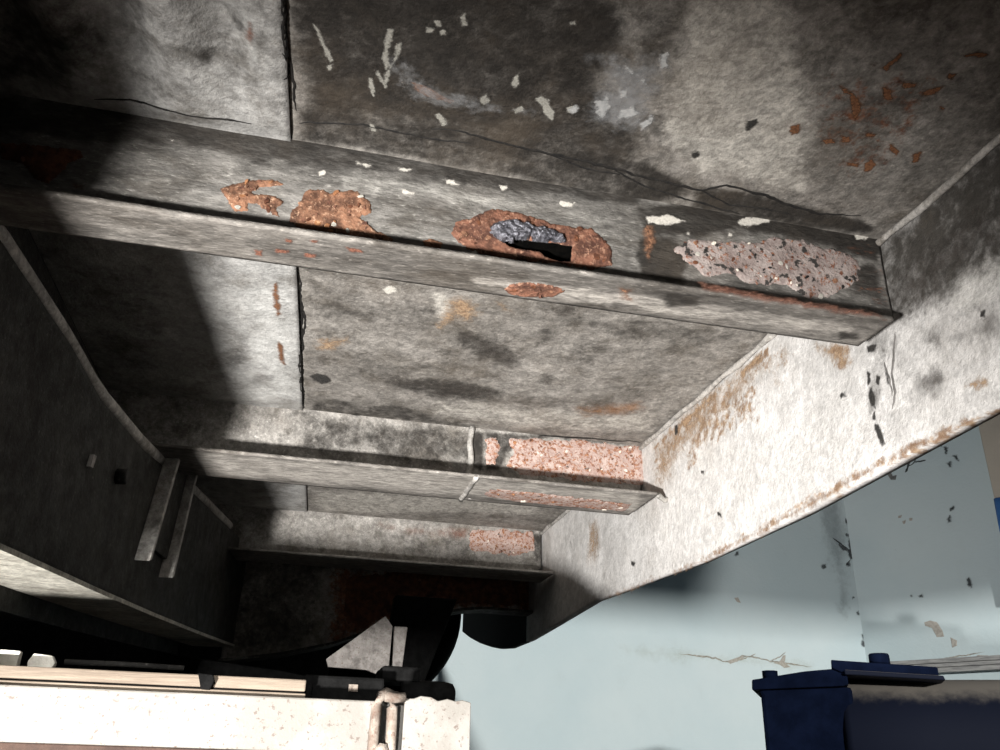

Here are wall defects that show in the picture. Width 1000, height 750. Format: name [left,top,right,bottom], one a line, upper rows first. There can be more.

crack [94,98,251,124]
crack [281,0,861,216]
corrosion [221,179,394,258]
peeling [490,219,566,244]
corrosion [645,226,655,257]
corrosion [504,282,565,298]
crack [298,274,306,406]
corrosion [659,351,762,480]
crack [681,653,811,667]